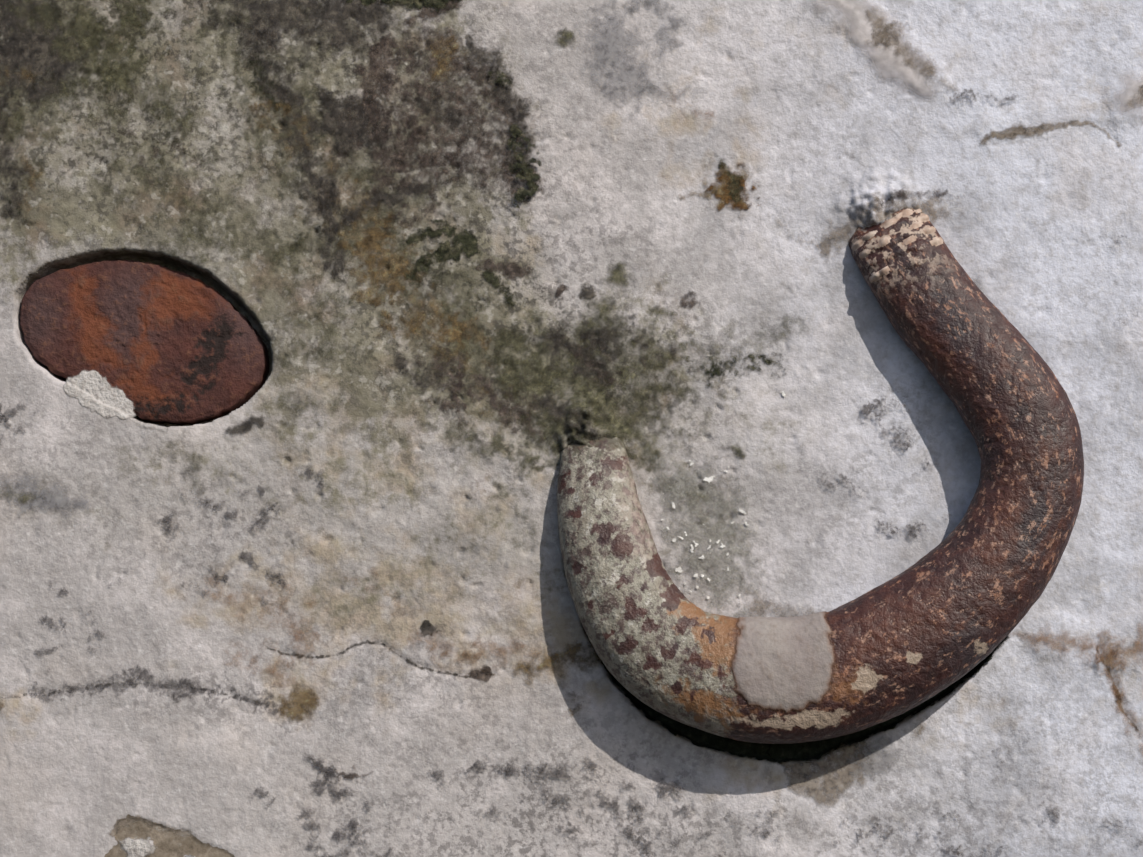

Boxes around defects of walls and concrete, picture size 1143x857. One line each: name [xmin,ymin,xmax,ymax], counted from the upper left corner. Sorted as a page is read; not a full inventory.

leakage [558,29,574,45]
leakage [591,7,666,107]
leakage [201,0,423,215]
leakage [466,37,534,202]
crack [981,120,1120,147]
leakage [395,346,544,454]
crack [0,640,494,720]
crack [420,620,438,636]
corrosion [517,643,601,683]
corrosion [1032,629,1143,660]
spalling [105,814,235,857]